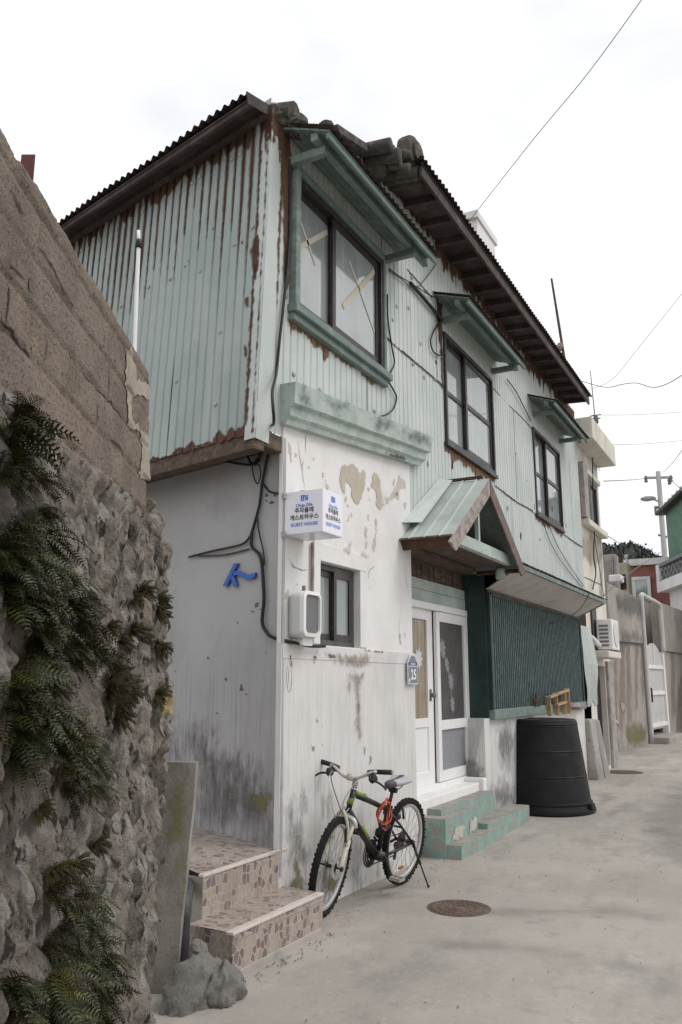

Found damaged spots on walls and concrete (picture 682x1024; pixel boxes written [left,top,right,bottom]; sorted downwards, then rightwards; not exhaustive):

rust [71,103,292,462]
rust [393,191,574,418]
rust [288,319,376,385]
peeling [322,464,407,558]
rust [444,446,494,482]